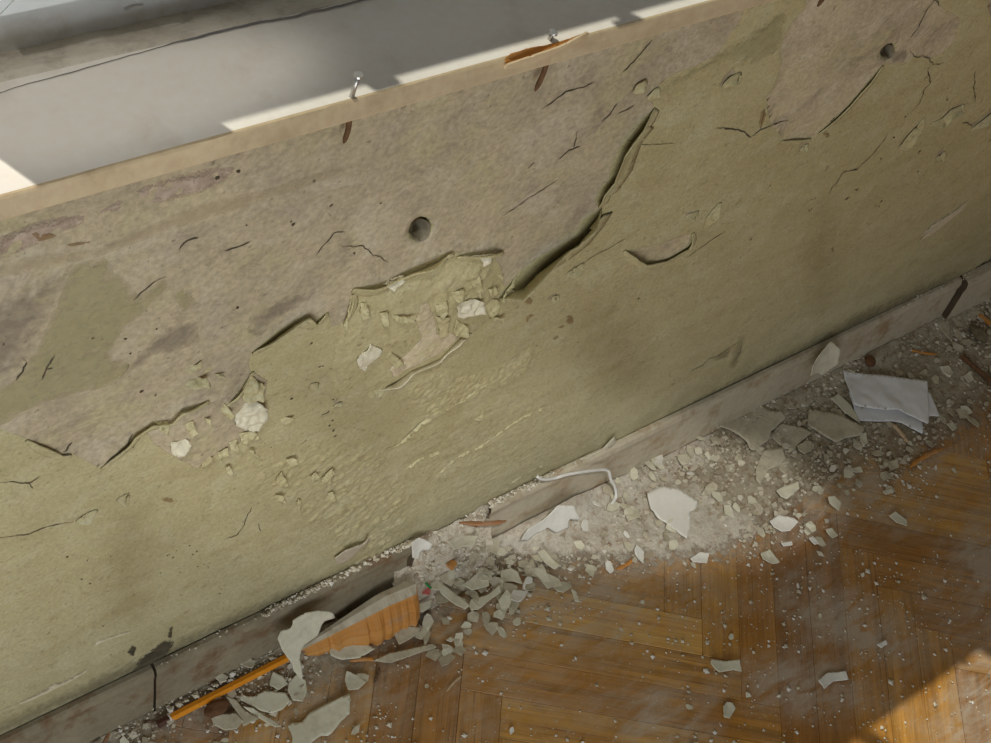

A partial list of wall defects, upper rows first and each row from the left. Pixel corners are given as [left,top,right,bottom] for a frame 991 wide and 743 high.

peeling [766,0,965,153]
crack [909,0,942,107]
peeling [0,10,744,477]